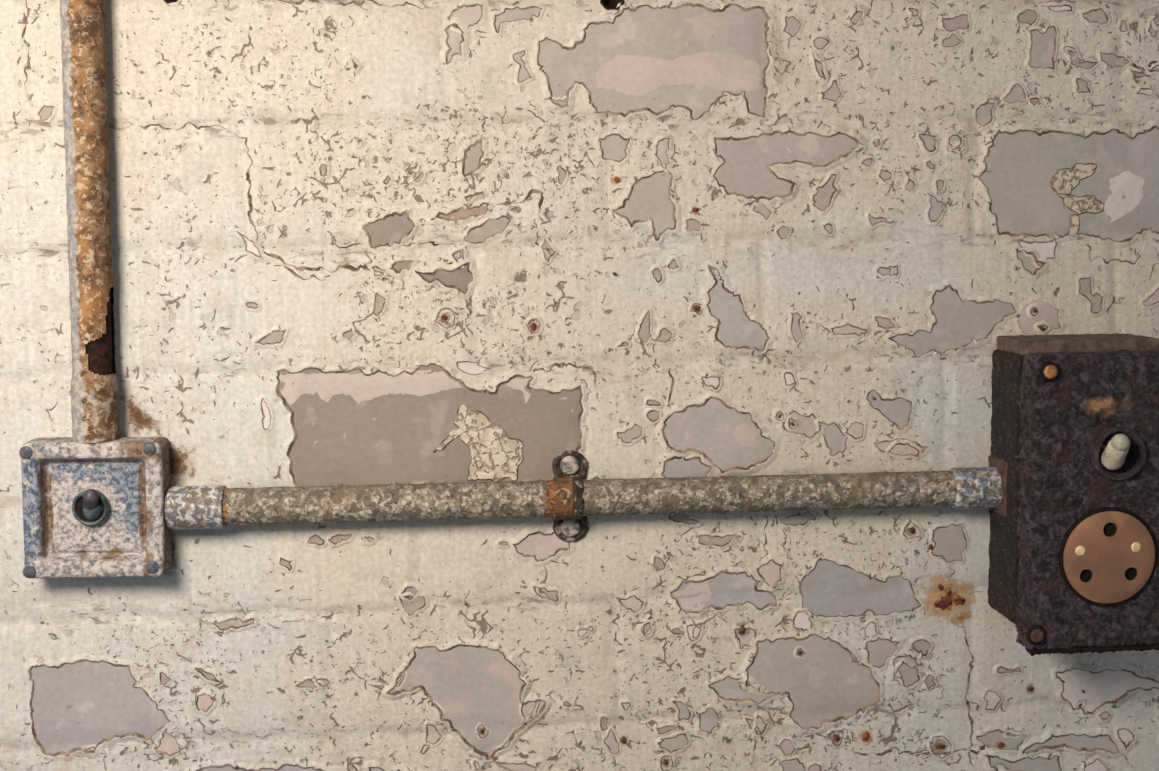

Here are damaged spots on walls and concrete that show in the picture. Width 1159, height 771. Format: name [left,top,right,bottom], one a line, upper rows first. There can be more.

peeling [438,0,1159,282]
peeling [827,278,1019,363]
rust [122,396,160,435]
rust [170,448,194,479]
peeling [256,358,588,487]
peeling [613,372,933,478]
rust [924,574,976,624]
peeling [21,653,176,762]
peeling [184,758,431,771]
peeling [380,637,586,771]
peeling [614,552,939,771]
peeling [973,661,1159,771]